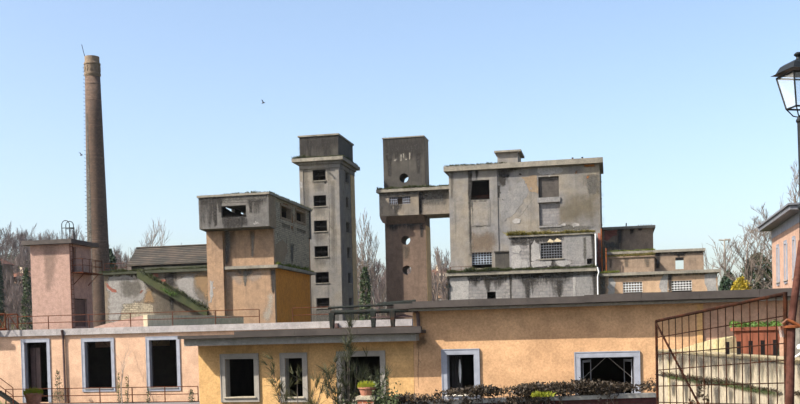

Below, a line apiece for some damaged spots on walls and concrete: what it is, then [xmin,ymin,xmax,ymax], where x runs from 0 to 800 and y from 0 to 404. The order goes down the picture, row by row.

leakage [497,168,521,198]
leakage [200,197,265,263]
leakage [450,224,714,298]
flaking render [105,274,155,322]
flaking render [152,273,215,305]